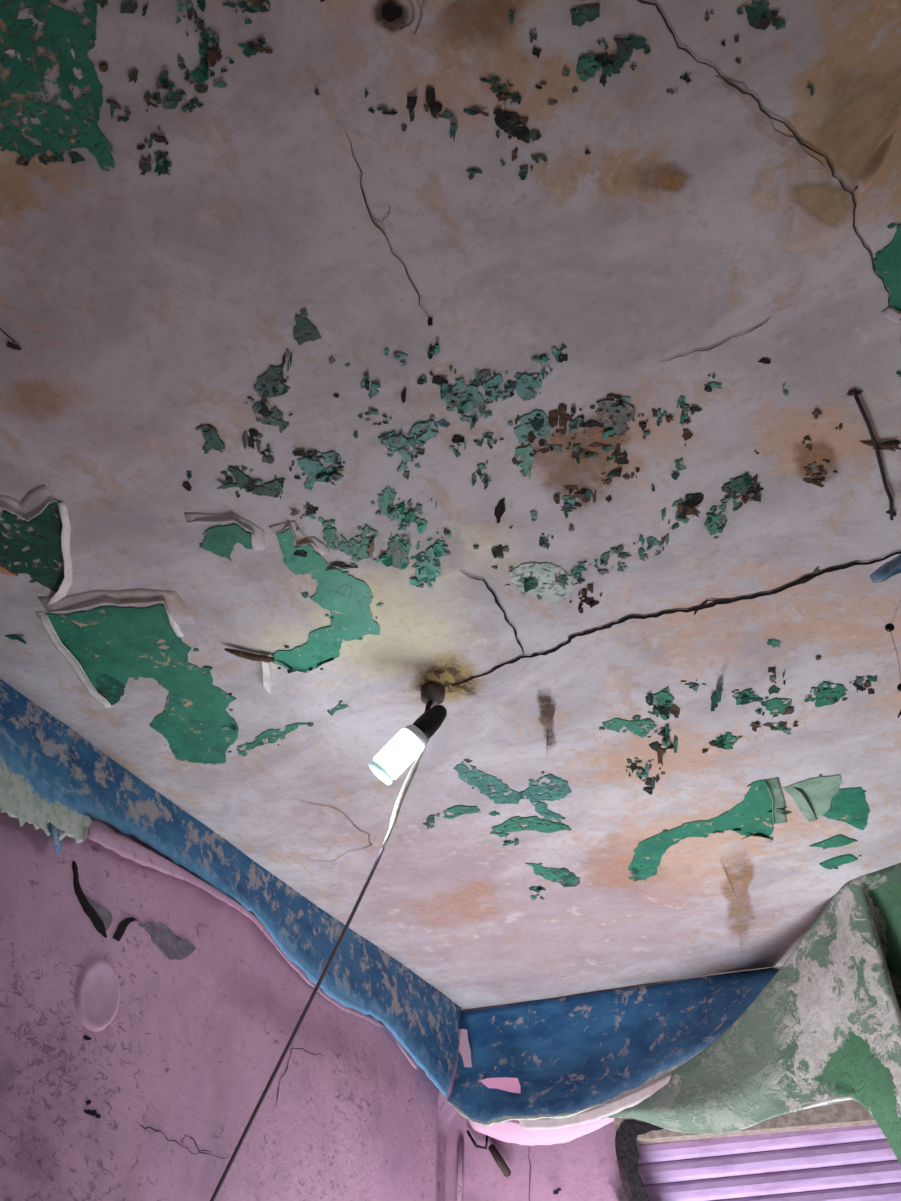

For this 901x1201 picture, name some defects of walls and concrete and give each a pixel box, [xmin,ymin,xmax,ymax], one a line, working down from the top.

peeling [0,0,148,171]
crack [346,134,430,319]
crack [637,0,901,320]
leakage [795,185,848,224]
crack [658,318,770,362]
peeling [0,485,313,765]
peeling [184,309,451,695]
peeling [353,343,702,532]
peeling [473,472,764,613]
crack [452,551,901,686]
peeling [0,668,901,1201]
crack [139,1124,224,1159]